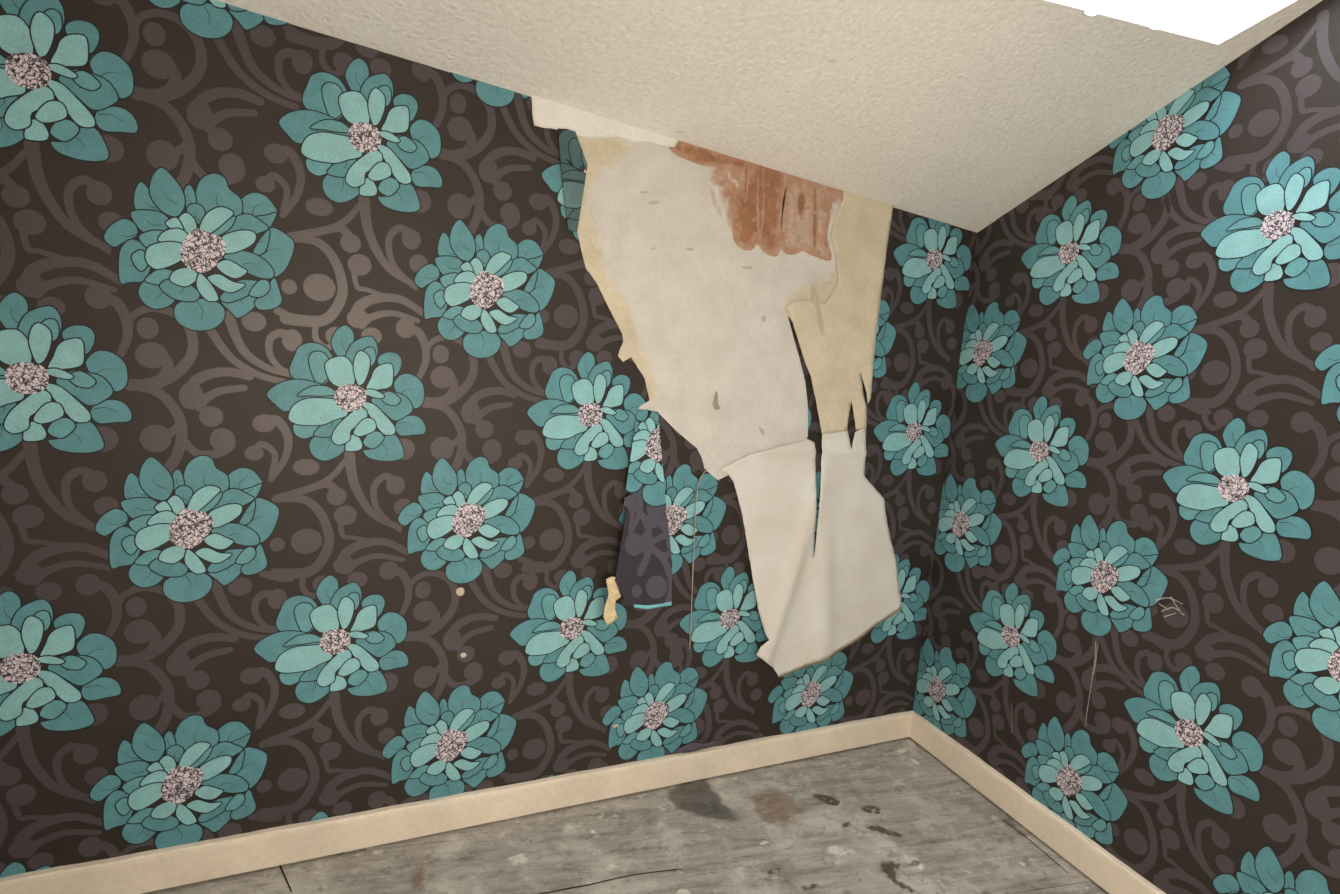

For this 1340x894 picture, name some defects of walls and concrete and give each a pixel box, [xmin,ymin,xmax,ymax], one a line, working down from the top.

flaking render [531,95,836,480]
damp [666,140,843,265]